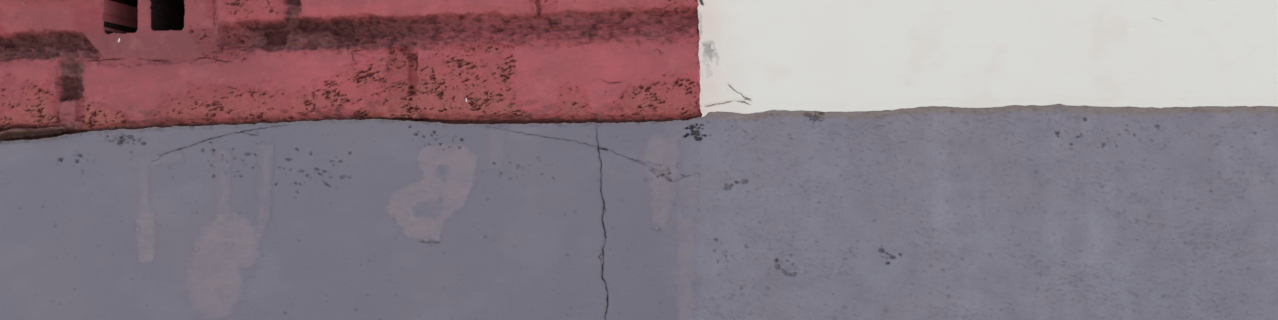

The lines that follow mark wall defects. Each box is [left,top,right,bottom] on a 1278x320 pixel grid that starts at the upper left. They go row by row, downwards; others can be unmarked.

spalling [188,0,289,66]
spalling [0,71,148,148]
spalling [147,37,528,125]
peeling [382,143,481,244]
crack [598,145,608,315]